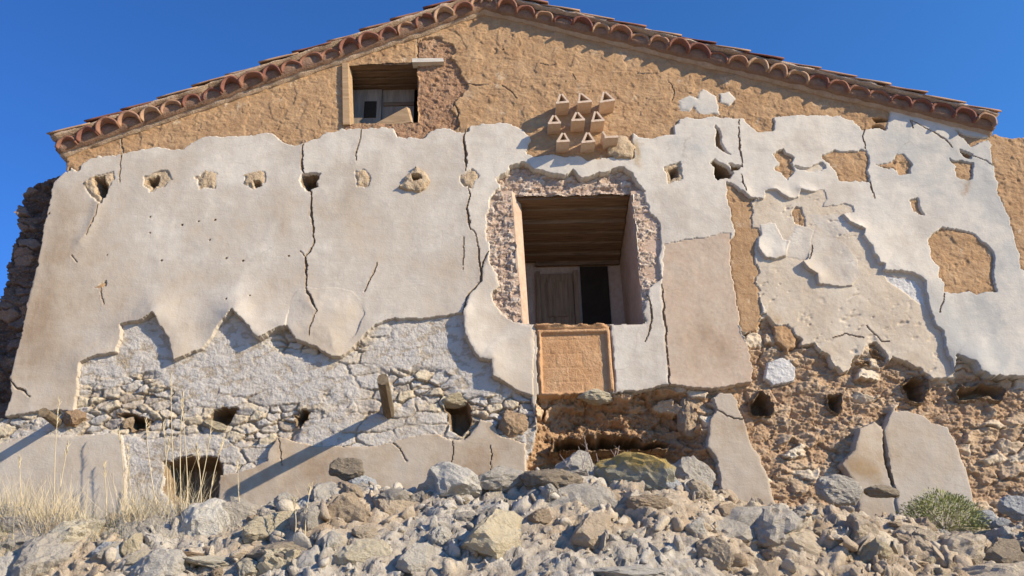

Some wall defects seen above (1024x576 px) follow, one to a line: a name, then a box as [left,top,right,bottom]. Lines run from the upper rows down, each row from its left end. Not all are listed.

crack [299,140,318,336]
crack [364,262,378,292]
crack [452,83,517,313]
spalling [774,150,911,182]
spalling [928,229,995,295]
spalling [951,132,1024,270]
spalling [0,161,953,515]
crack [644,284,671,387]
spalling [951,383,1007,404]